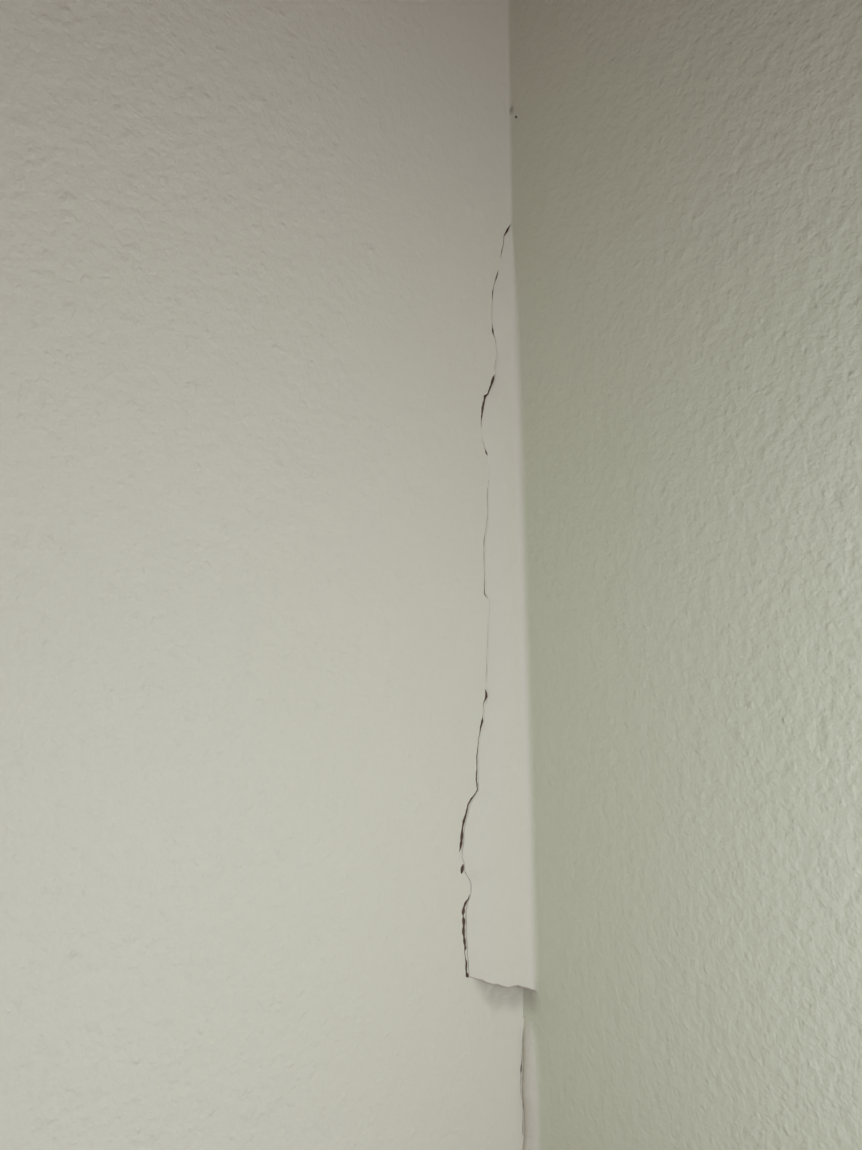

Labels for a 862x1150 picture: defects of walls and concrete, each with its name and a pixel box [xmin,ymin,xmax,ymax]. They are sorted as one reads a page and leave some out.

crack [492,225,510,299]
crack [481,326,497,539]
crack [459,641,488,978]